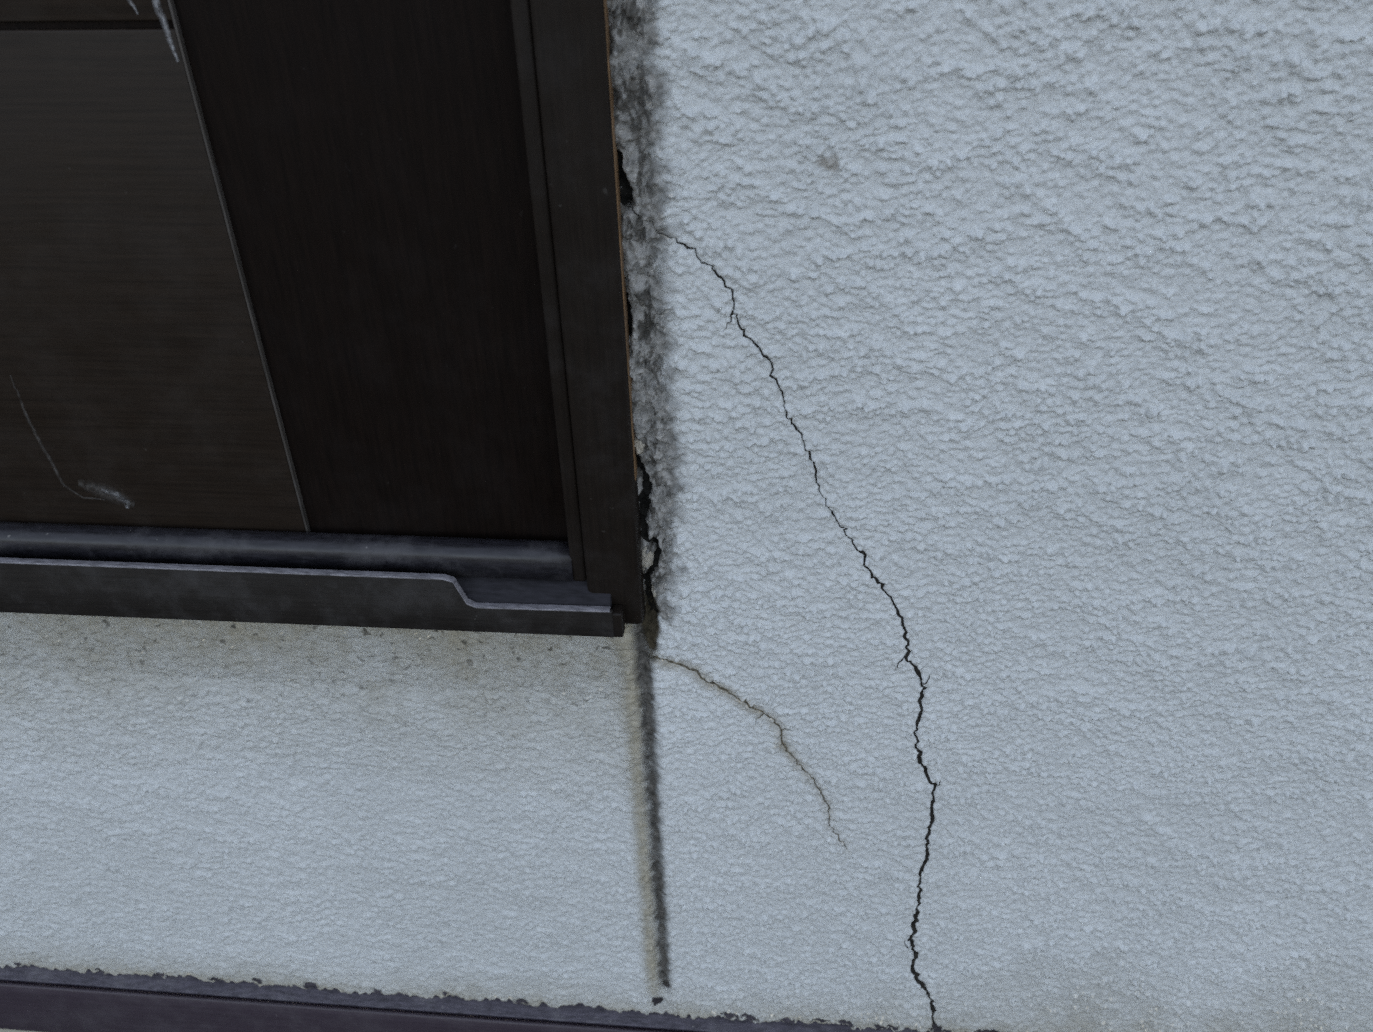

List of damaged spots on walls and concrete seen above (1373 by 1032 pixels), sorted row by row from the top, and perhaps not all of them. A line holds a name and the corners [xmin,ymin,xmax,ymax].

leakage [609,0,644,54]
leakage [613,65,650,243]
leakage [41,614,344,661]
leakage [362,627,571,678]
leakage [594,274,665,988]
crack [627,201,941,1026]